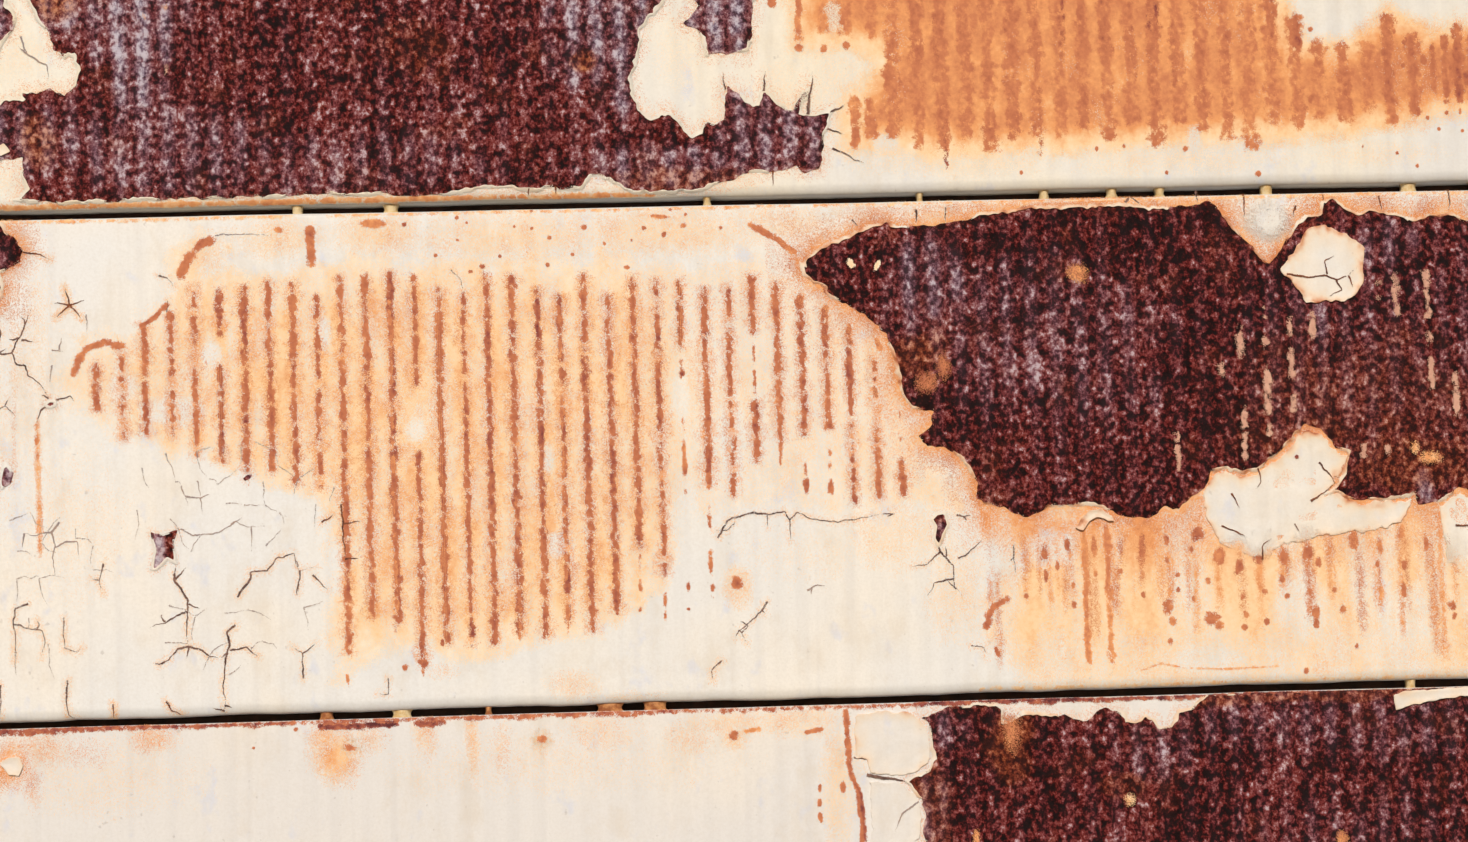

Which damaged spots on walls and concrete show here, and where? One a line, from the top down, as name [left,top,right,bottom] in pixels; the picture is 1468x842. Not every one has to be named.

peeling [0,0,839,328]
rust [736,0,1468,175]
crack [0,249,87,421]
peeling [765,190,1468,566]
crack [0,513,121,721]
crack [135,442,363,717]
rust [0,191,1468,842]
crack [707,596,771,686]
crack [710,503,898,545]
crack [910,513,1020,596]
crack [854,757,919,830]
peeling [854,686,1468,842]